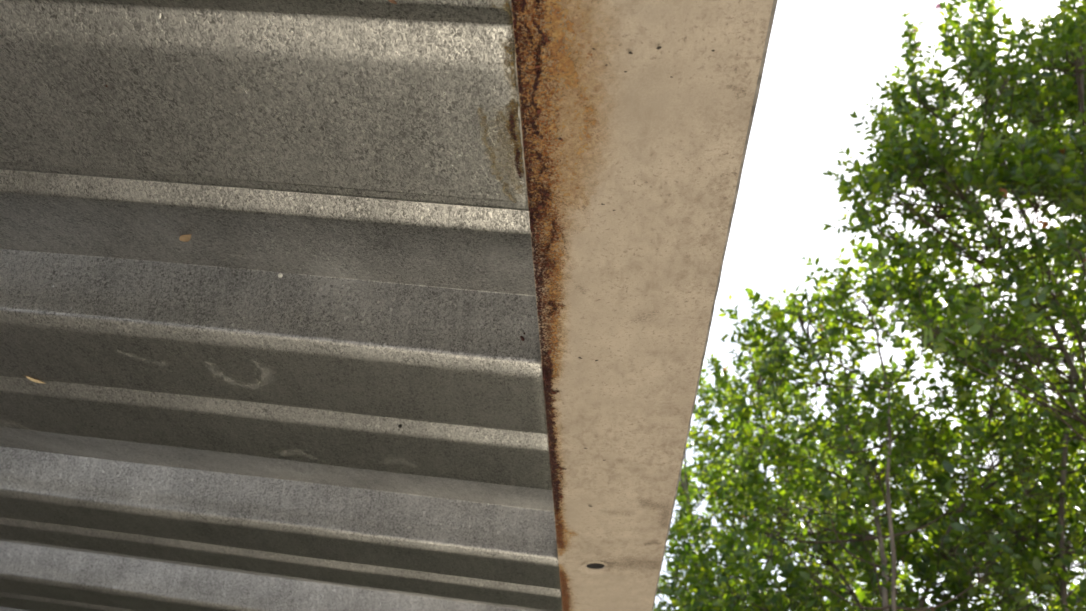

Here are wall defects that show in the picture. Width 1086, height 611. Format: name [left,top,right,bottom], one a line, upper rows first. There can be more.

rust [511,0,603,611]